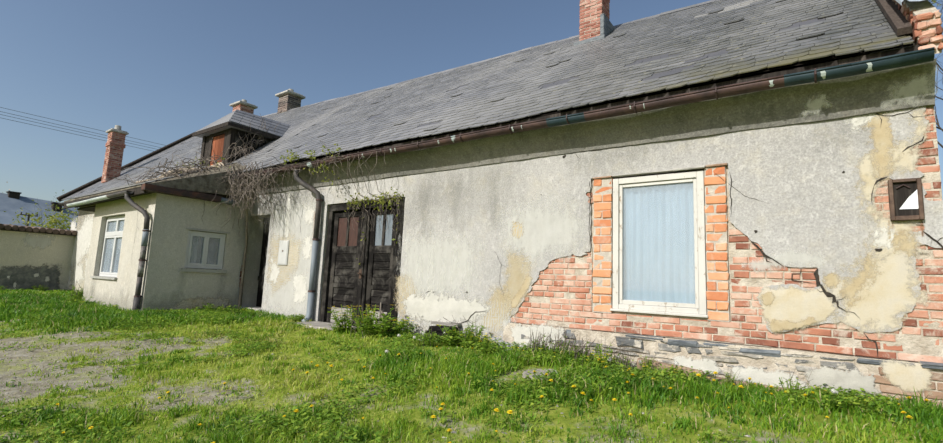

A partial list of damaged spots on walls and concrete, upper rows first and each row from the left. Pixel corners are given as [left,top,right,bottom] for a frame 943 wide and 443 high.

spalling [495,77,943,363]